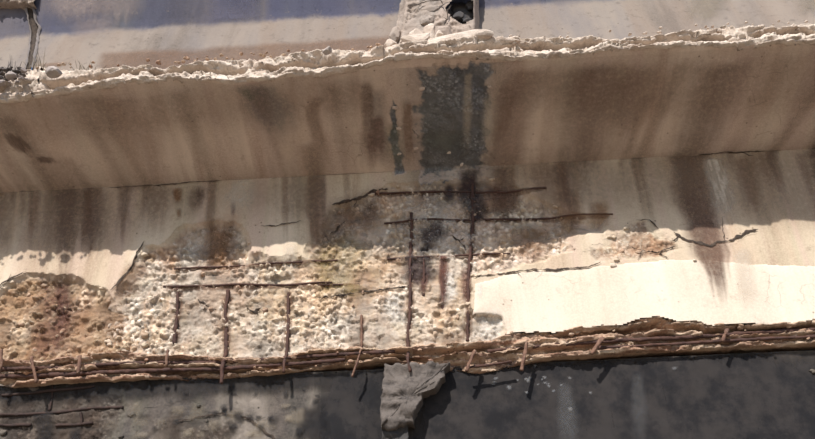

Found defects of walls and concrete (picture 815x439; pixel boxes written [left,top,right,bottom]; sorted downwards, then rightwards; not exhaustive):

crack [25,7,41,69]
spalling [0,15,815,185]
crack [108,240,144,291]
spalling [0,217,385,379]
rust [171,283,349,345]
rust [375,170,605,341]
spalling [303,175,815,374]
crack [631,217,760,259]
water stain [676,155,732,283]
spalling [0,393,256,439]
water stain [210,405,273,429]
water stain [283,391,326,439]